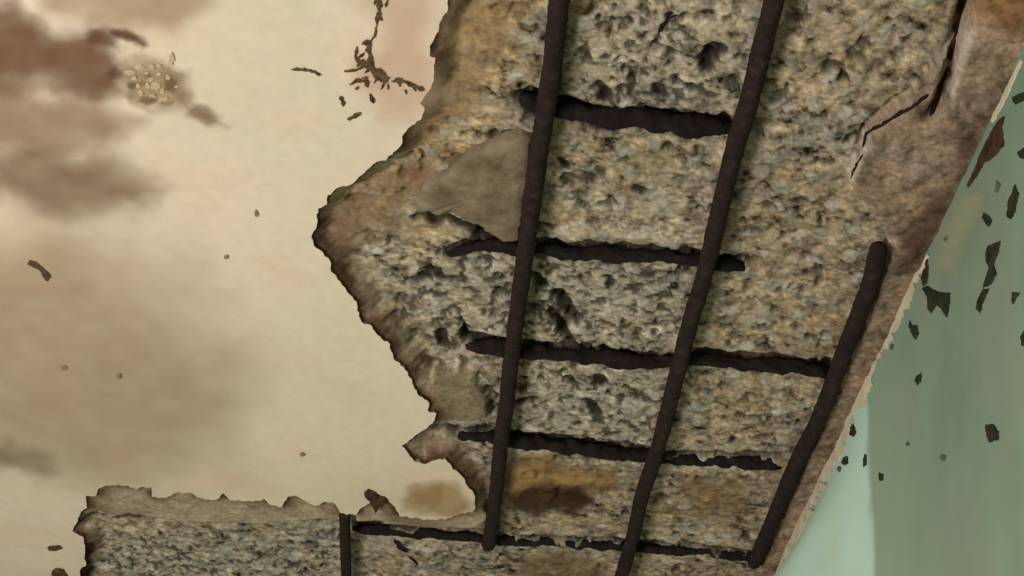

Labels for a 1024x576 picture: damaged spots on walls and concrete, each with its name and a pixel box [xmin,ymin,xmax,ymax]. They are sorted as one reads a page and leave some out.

leakage [0,9,115,144]
spalling [558,0,763,122]
crack [850,0,967,179]
leakage [0,159,135,205]
spalling [51,0,728,576]
spalling [629,0,972,576]
corrosion [406,486,466,516]
corrosion [505,459,617,515]